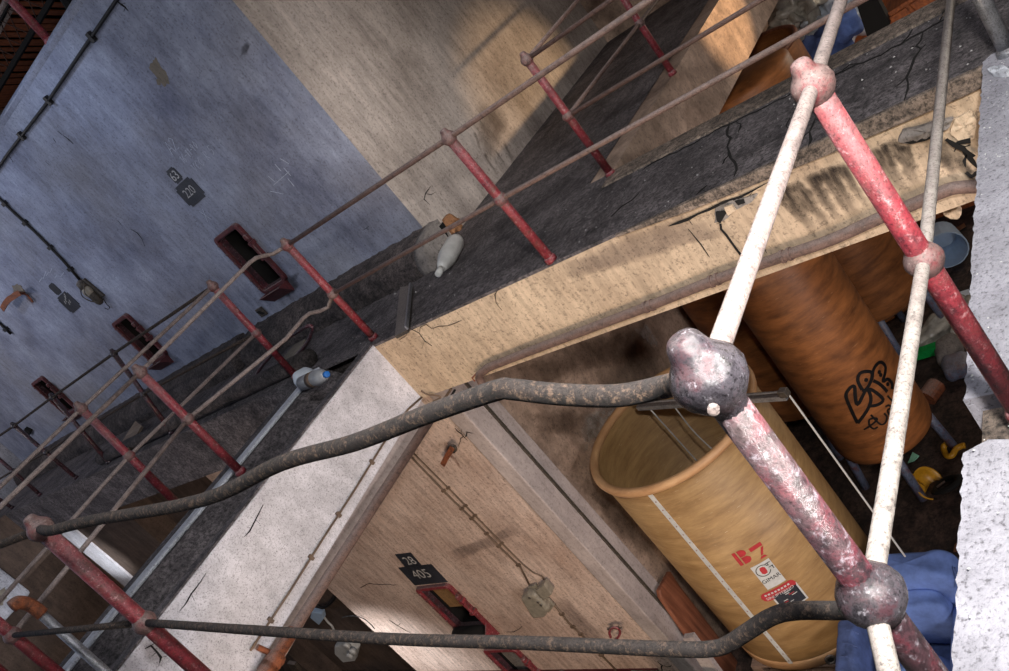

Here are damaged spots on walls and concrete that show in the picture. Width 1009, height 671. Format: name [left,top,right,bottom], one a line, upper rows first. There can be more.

peeling [149,57,169,87]
crack [835,11,944,100]
crack [644,93,816,256]